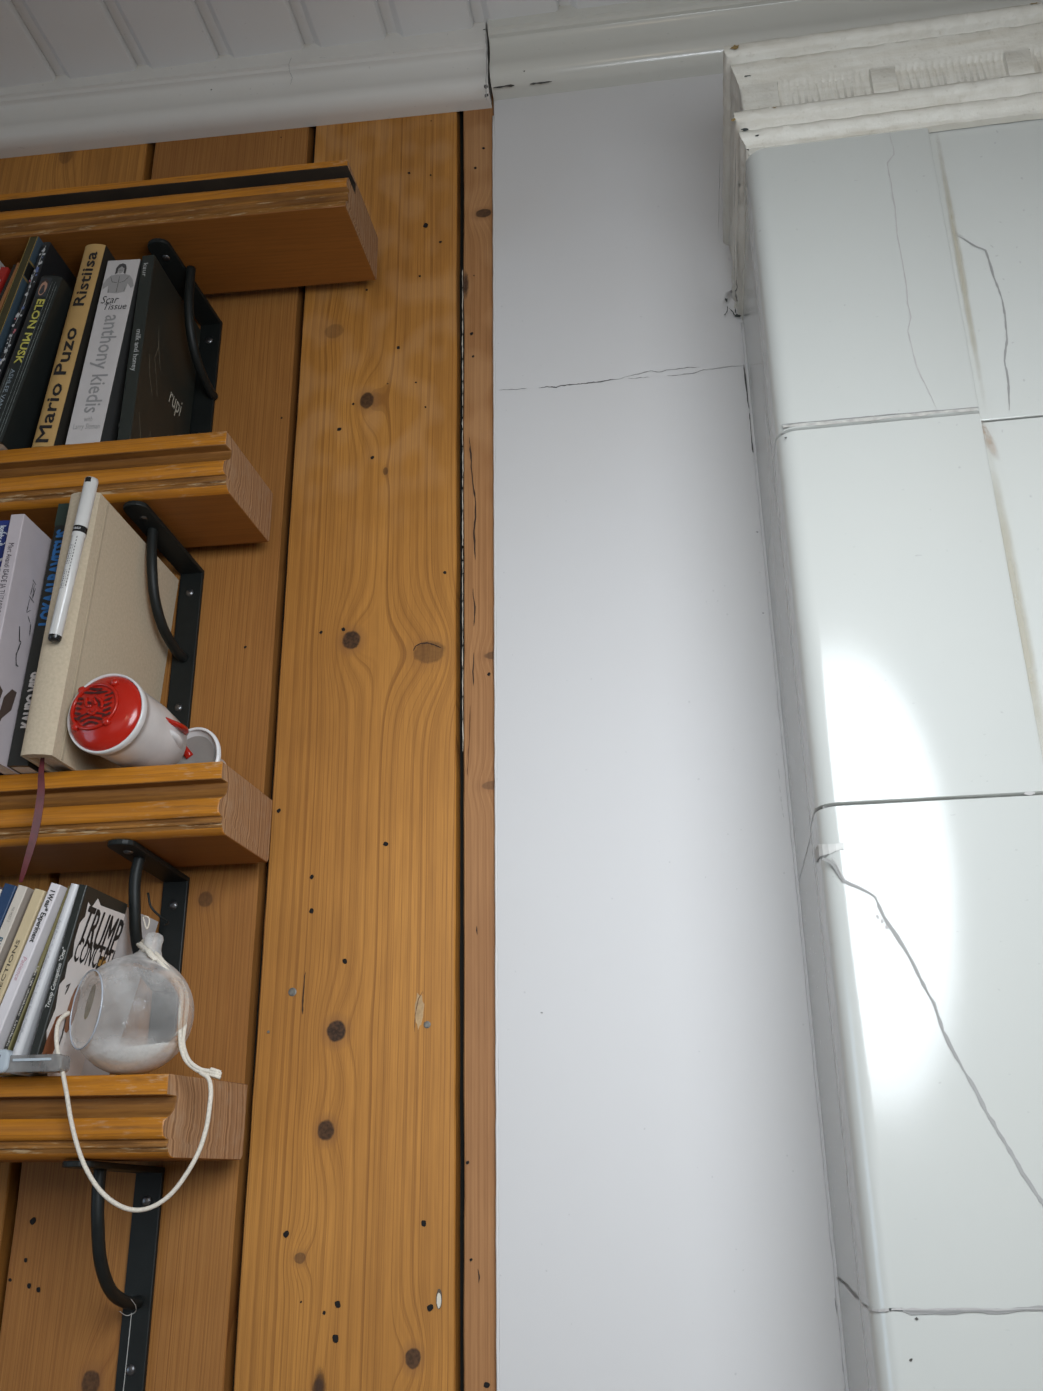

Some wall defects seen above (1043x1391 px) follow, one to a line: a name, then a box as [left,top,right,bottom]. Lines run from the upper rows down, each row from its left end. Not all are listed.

crack [503,366,753,451]
crack [887,132,936,407]
crack [951,231,1010,410]
crack [822,857,1043,1206]
crack [835,1278,1043,1315]